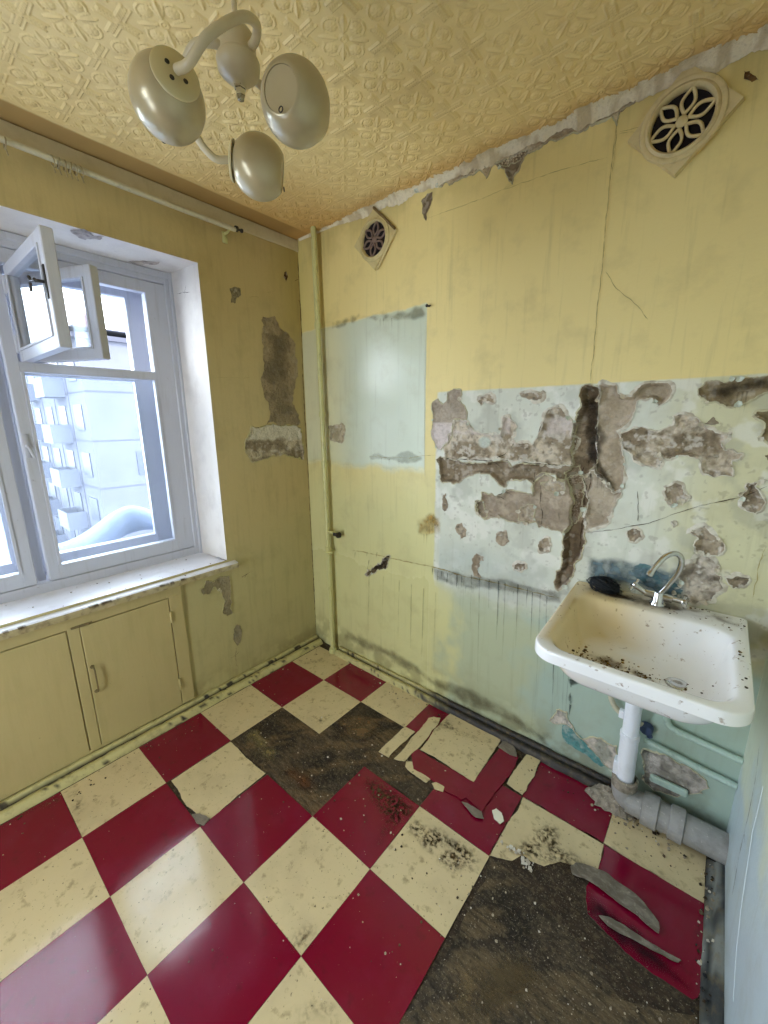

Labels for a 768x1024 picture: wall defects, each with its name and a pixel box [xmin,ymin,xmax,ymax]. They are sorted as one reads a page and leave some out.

flaking render [414,100,636,220]
crack [432,109,647,376]
peeling [244,316,305,463]
flaking render [697,375,768,460]
crack [378,445,767,544]
flaking render [431,379,745,592]
flaking render [364,554,391,577]
flaking render [632,520,752,607]
peeling [231,703,449,816]
flaking render [550,709,618,772]
flaking render [640,748,709,797]
peeling [399,857,699,1024]